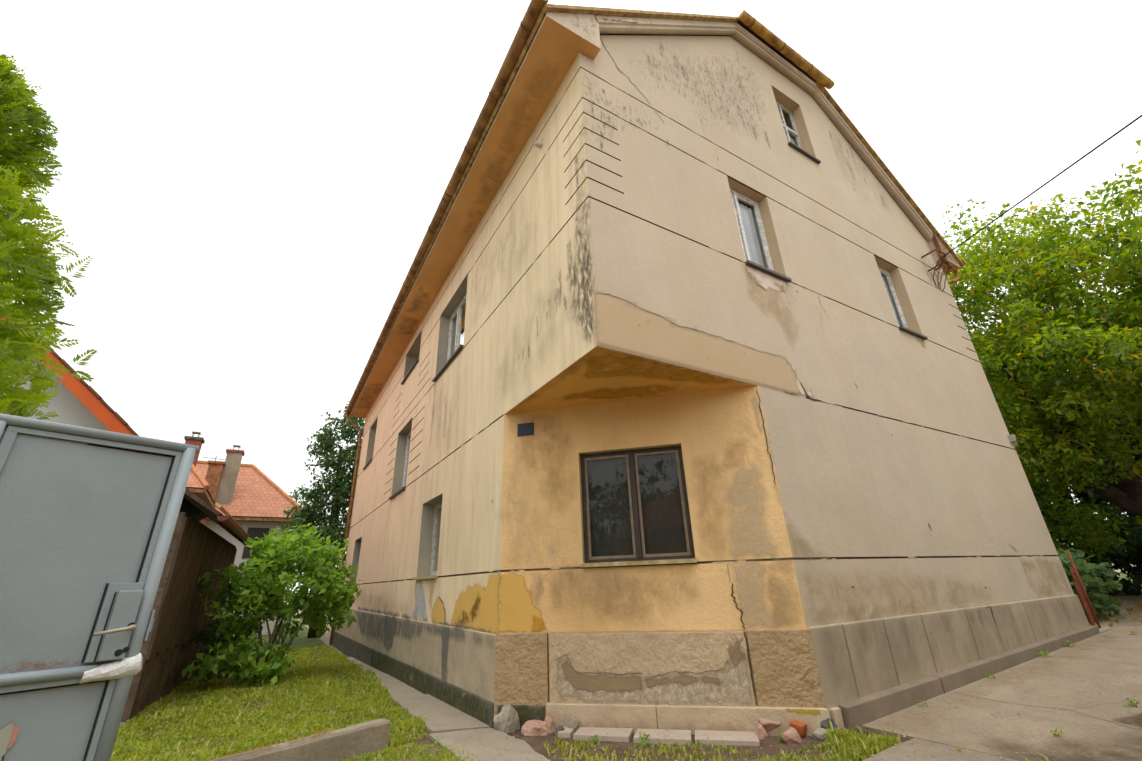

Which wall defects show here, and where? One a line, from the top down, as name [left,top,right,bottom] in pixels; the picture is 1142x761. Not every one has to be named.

damp [564,218,592,332]
flaking render [746,266,798,292]
damp [358,590,490,681]
flaking render [556,637,752,706]
crack [727,564,756,696]